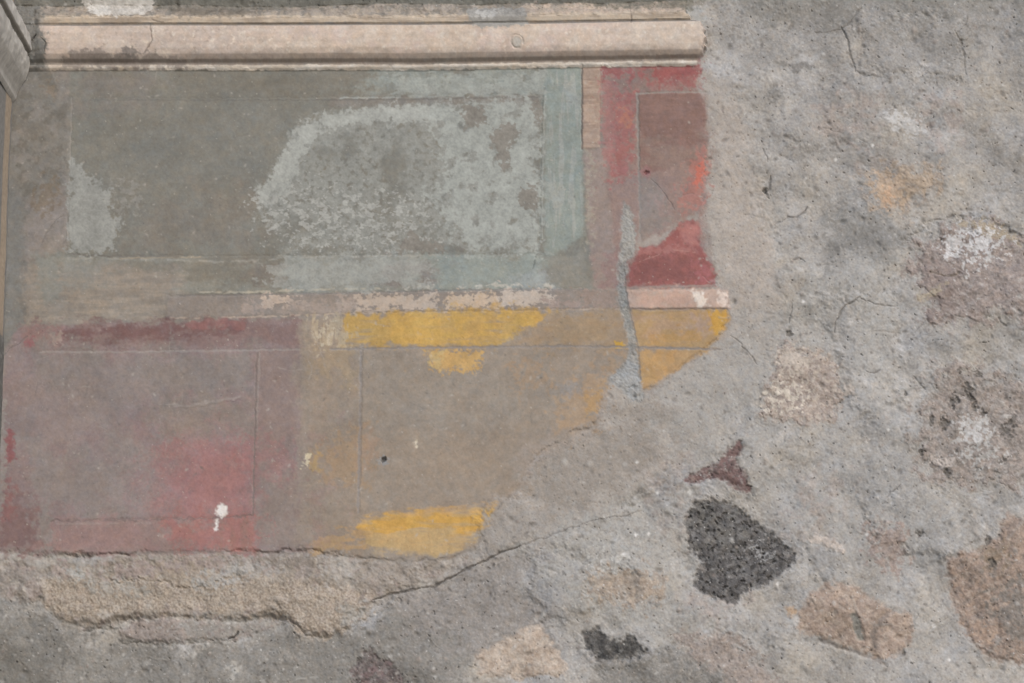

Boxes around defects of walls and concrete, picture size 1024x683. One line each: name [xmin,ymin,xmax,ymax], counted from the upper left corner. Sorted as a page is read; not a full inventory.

crack [814,13,883,79]
flaking render [0,553,459,645]
crack [373,510,643,601]